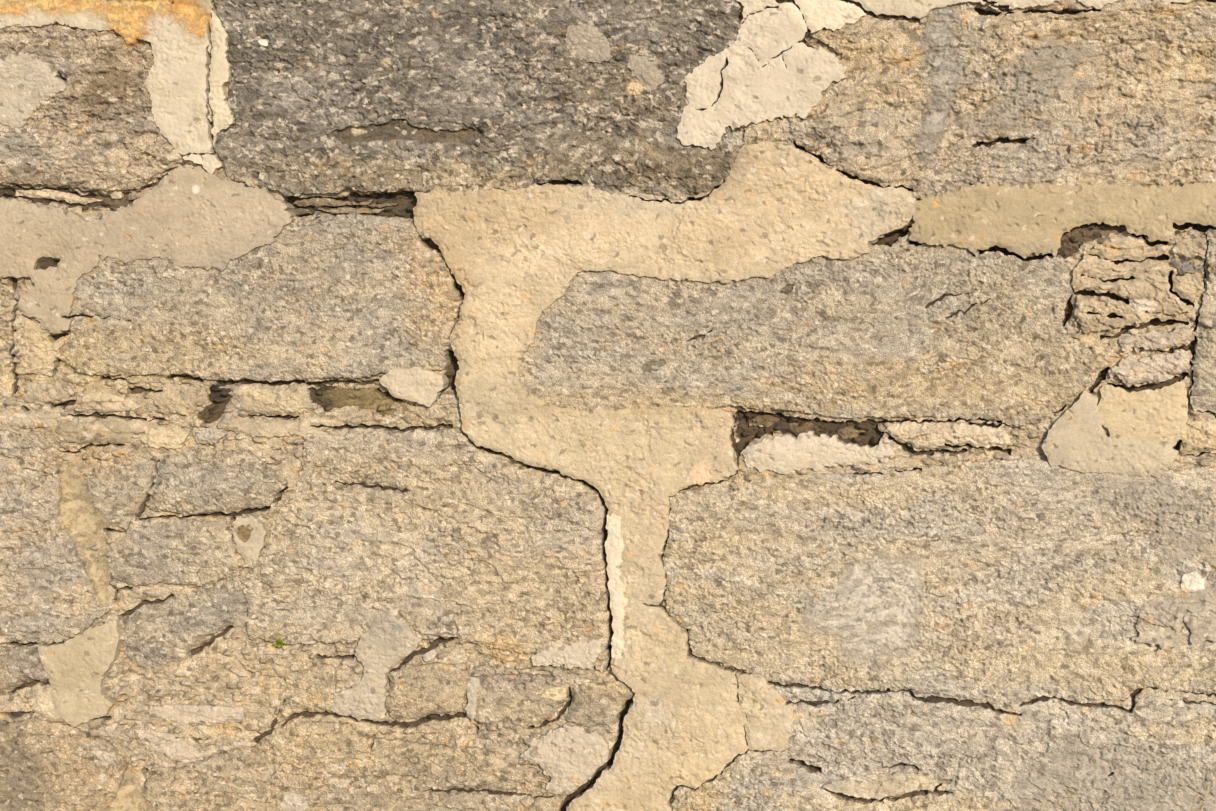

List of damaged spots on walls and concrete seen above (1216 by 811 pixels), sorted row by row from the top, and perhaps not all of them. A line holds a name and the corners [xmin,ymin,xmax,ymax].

flaking render [1078,0,1126,11]
flaking render [677,0,1060,150]
crack [480,446,614,666]
crack [645,415,1216,715]
crack [254,701,466,744]
crack [429,698,633,811]
crack [669,733,948,804]